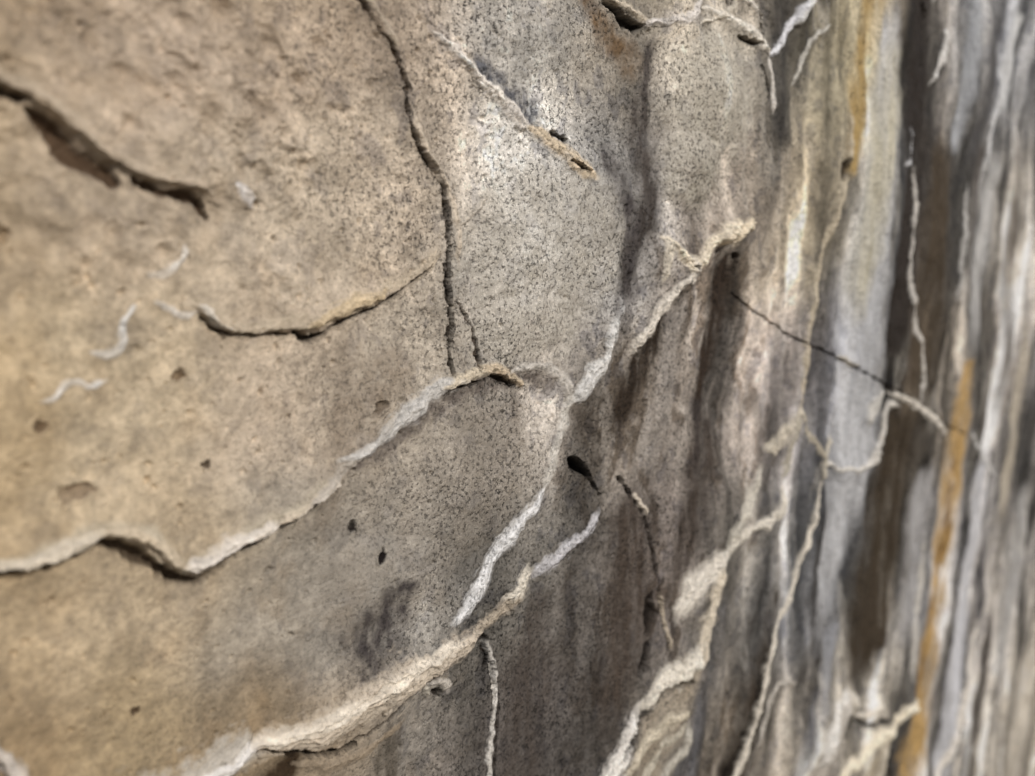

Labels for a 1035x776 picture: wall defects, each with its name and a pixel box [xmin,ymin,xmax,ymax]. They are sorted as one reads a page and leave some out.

crack [357,0,516,392]
crack [549,130,593,173]
crack [601,0,832,115]
crack [730,108,997,479]
crack [920,0,950,88]
crack [952,64,1001,303]
crack [256,667,450,759]
crack [478,632,501,776]
crack [569,465,674,678]
crack [721,481,824,776]
crack [809,534,929,776]
crack [933,598,1018,776]